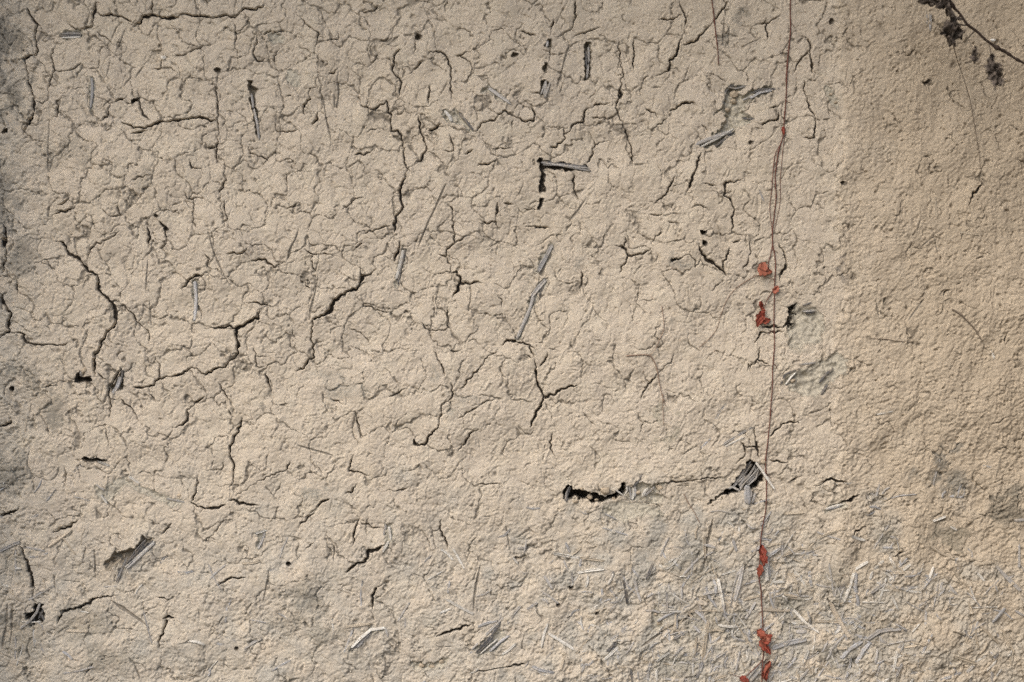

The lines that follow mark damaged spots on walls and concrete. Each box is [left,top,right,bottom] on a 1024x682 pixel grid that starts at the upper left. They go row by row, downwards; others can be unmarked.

crack [24,8,81,134]
crack [67,2,339,63]
crack [0,222,69,346]
crack [46,208,290,541]
crack [99,48,282,288]
crack [416,191,578,454]
crack [299,1,727,370]
crack [614,156,751,289]
crack [300,400,408,610]
crack [740,421,800,483]
crack [823,477,858,506]
crack [58,595,114,622]